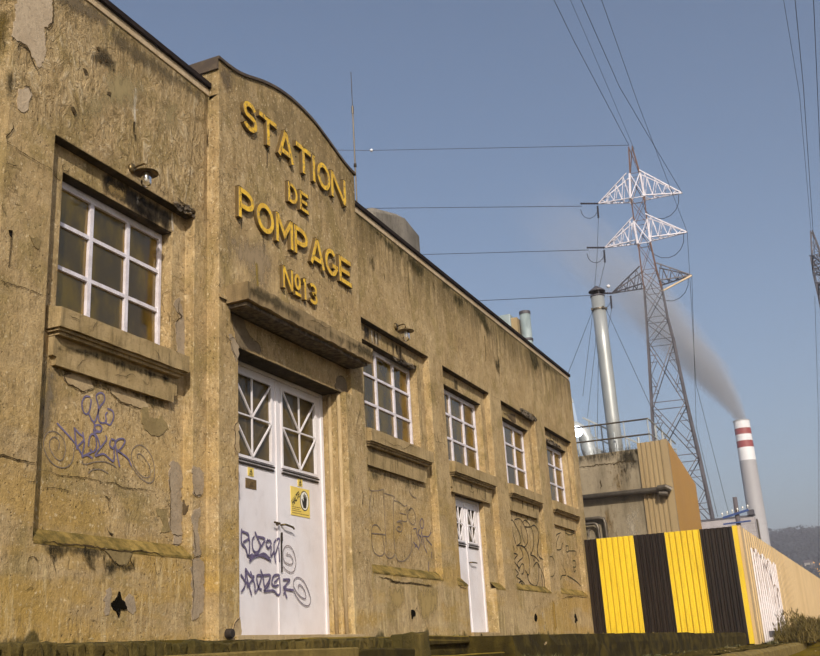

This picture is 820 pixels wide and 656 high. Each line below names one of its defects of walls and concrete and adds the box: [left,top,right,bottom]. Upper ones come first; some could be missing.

flaking render [11,0,54,68]
leakage [61,0,209,101]
flaking render [17,86,33,112]
flaking render [62,372,94,393]
flaking render [108,386,168,436]
crack [0,454,181,574]
leakage [49,545,98,566]
leakage [105,561,135,572]
flaking render [156,460,205,620]
flaking render [125,594,136,615]